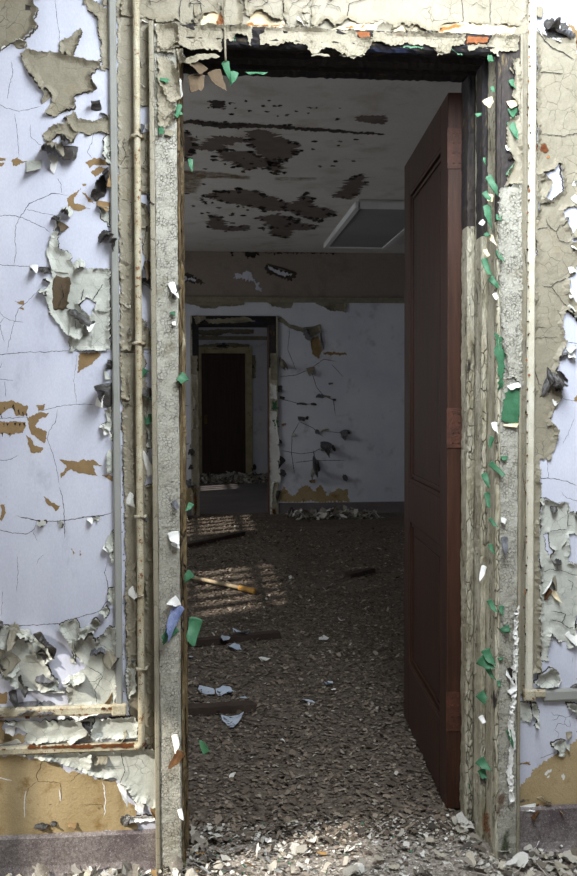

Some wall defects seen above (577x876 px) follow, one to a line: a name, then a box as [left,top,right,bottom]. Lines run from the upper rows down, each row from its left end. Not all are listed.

crack [149,0,204,18]
crack [244,0,361,17]
crack [537,28,573,74]
crack [1,63,40,153]
crack [0,178,62,267]
crack [0,292,112,626]
flaking render [0,0,155,835]
peeling [140,0,577,820]